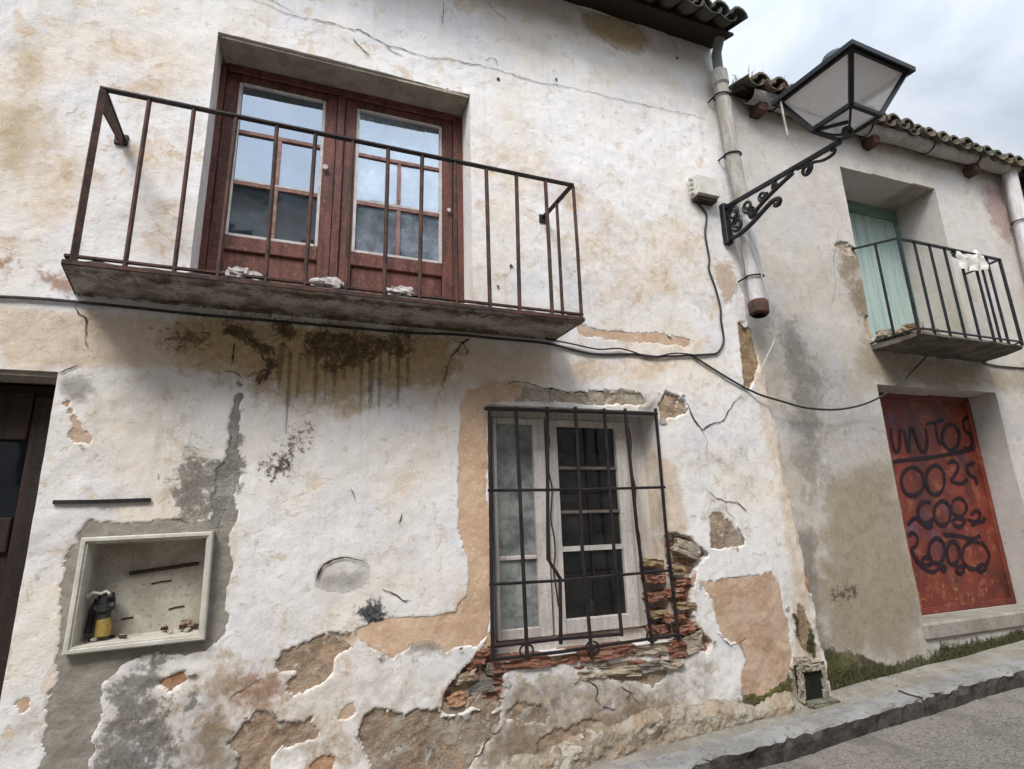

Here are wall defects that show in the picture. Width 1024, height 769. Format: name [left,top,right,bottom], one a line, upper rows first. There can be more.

crack [255,0,705,119]
damp [72,270,579,483]
crack [437,338,471,397]
peeling [577,325,690,348]
flaking render [658,393,687,424]
crack [687,397,744,447]
flaking render [738,323,758,388]
damp [158,419,246,522]
flaking render [704,513,745,555]
peeling [691,572,809,696]
flaking render [597,659,667,688]
flaking render [338,697,596,769]